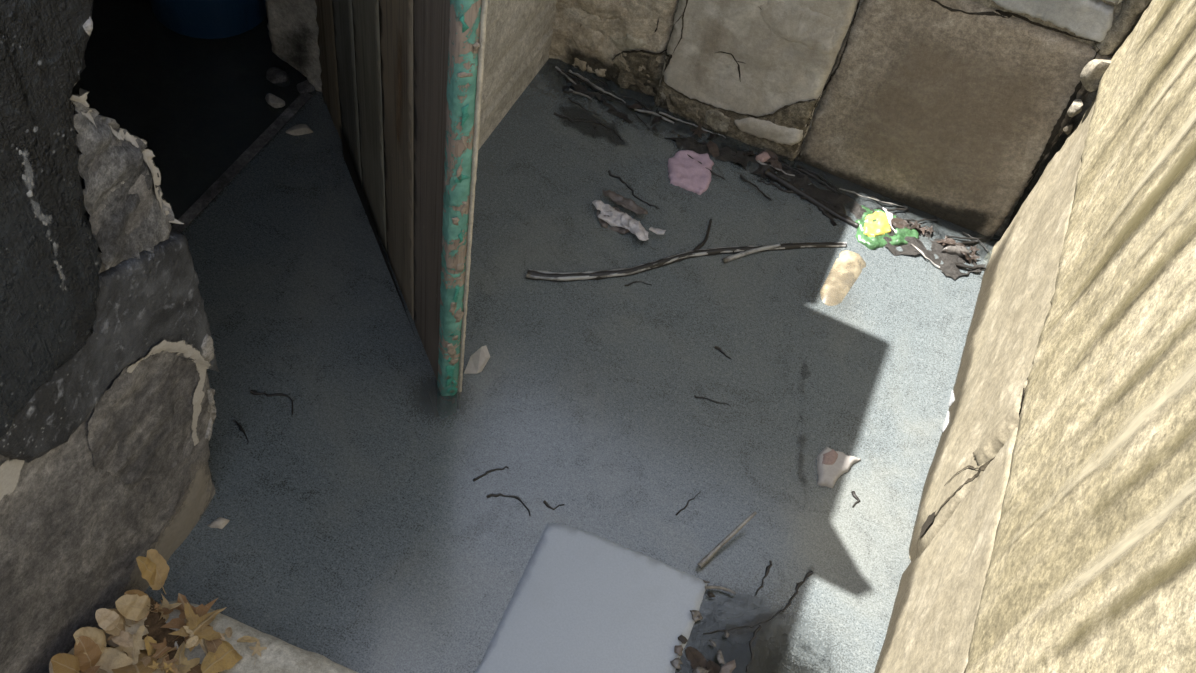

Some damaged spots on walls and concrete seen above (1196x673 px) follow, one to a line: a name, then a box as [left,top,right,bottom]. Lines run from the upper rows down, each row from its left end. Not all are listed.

spalling [70,74,184,270]
peeling [0,459,25,501]
peeling [88,334,216,485]
crack [928,457,995,527]